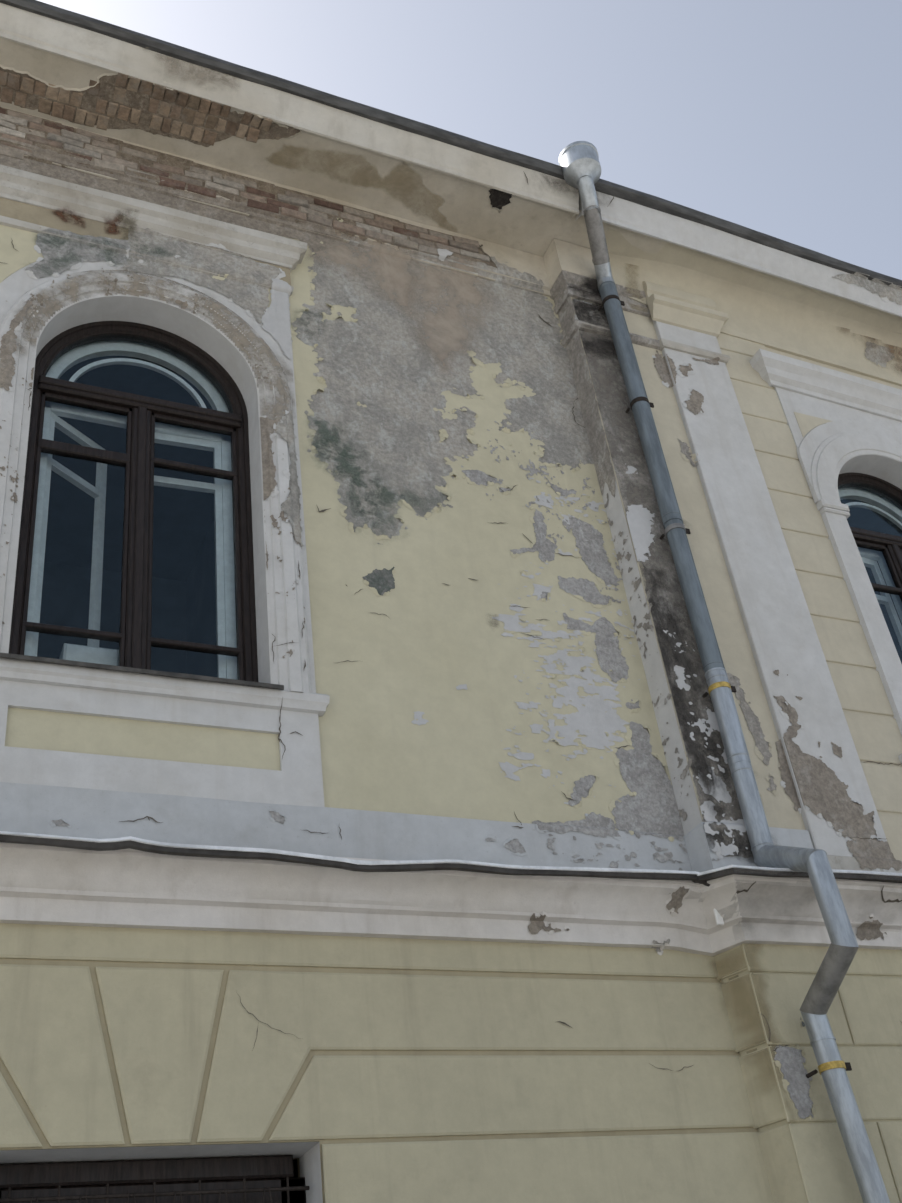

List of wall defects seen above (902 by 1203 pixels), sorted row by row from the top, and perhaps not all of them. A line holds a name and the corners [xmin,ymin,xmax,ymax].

peeling [832,272,902,305]
water stain [570,278,645,459]
flaking render [864,341,895,368]
peeling [0,64,754,871]
crack [278,698,303,758]
water stain [642,536,753,858]
peeling [727,673,902,873]
crack [119,815,163,823]
crack [240,999,301,1048]
flaking render [773,1043,816,1121]